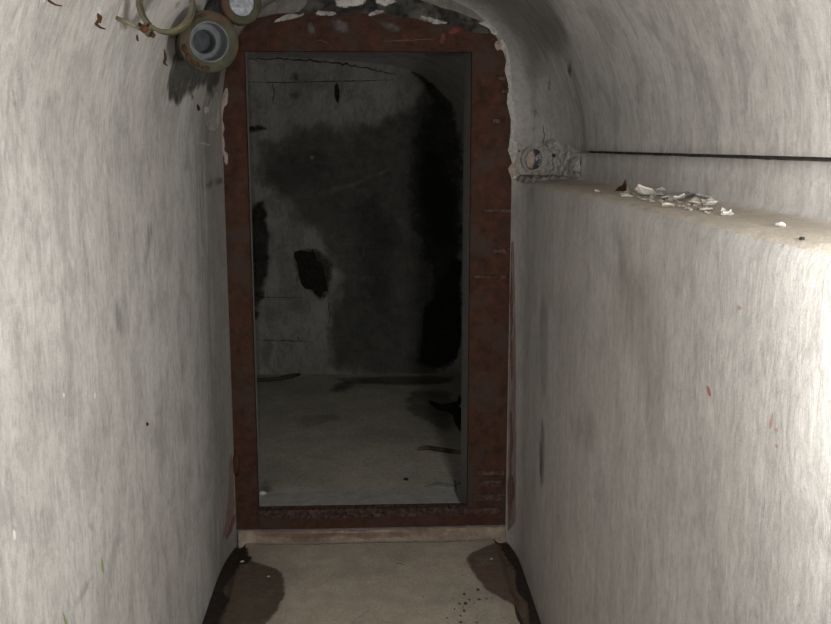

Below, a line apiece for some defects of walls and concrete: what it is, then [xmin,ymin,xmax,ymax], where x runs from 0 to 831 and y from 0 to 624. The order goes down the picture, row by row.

water stain [168,54,221,104]
spalling [275,0,517,179]
water stain [252,202,269,319]
water stain [263,72,463,374]
corrosion [507,243,516,530]
corrosion [258,503,468,519]
water stain [202,548,285,624]
water stain [449,542,541,624]